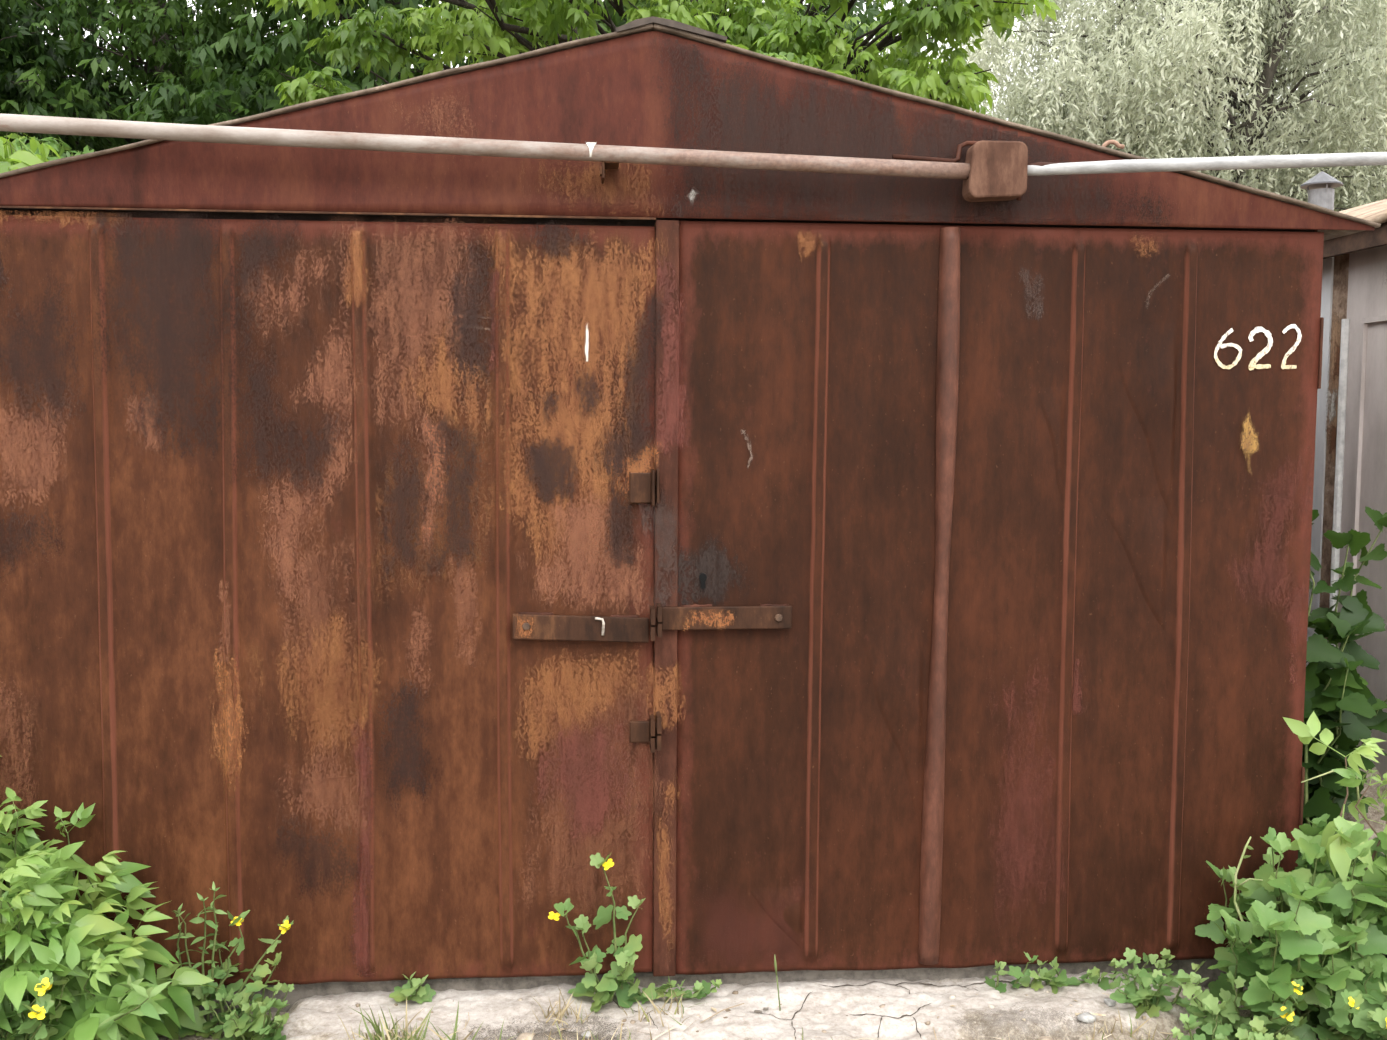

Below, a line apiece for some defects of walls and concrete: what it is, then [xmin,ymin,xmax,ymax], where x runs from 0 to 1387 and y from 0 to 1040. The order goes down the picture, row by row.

corrosion [0,210,132,229]
corrosion [797,230,822,257]
corrosion [0,395,71,507]
corrosion [240,218,690,616]
corrosion [1240,414,1259,470]
corrosion [515,614,535,638]
corrosion [684,609,735,630]
corrosion [211,581,249,790]
corrosion [515,649,685,759]
corrosion [657,780,679,945]
crack [747,980,1043,1040]